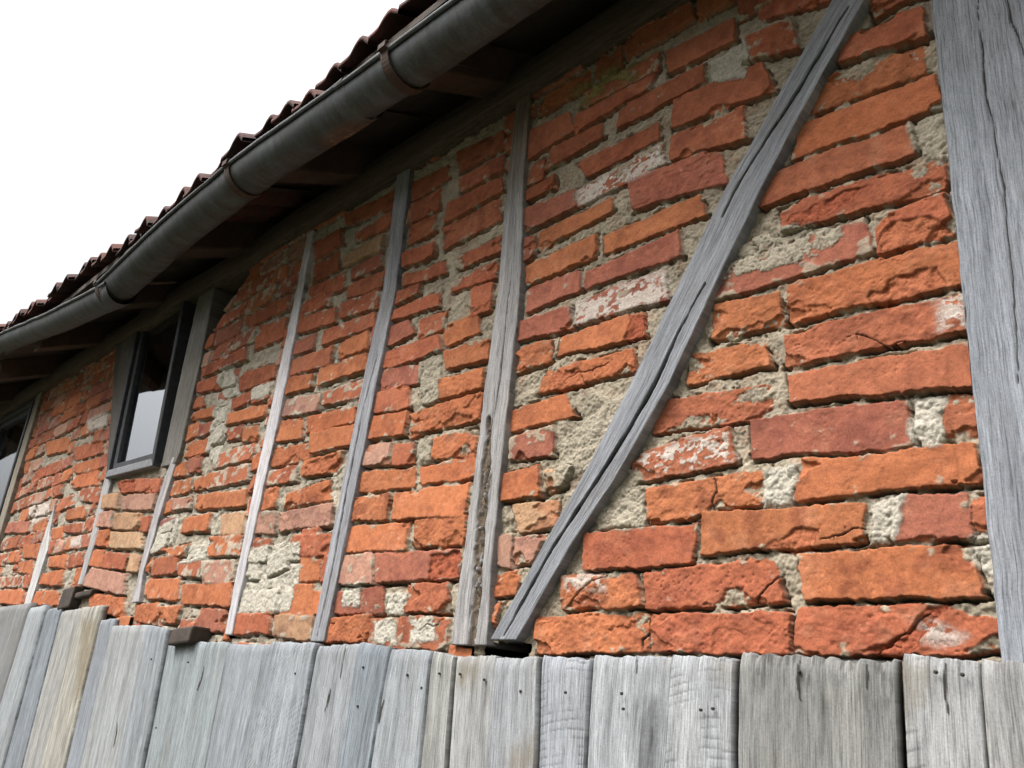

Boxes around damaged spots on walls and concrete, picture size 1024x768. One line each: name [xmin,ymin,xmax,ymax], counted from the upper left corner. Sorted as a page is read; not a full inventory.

crack [850,334,907,351]